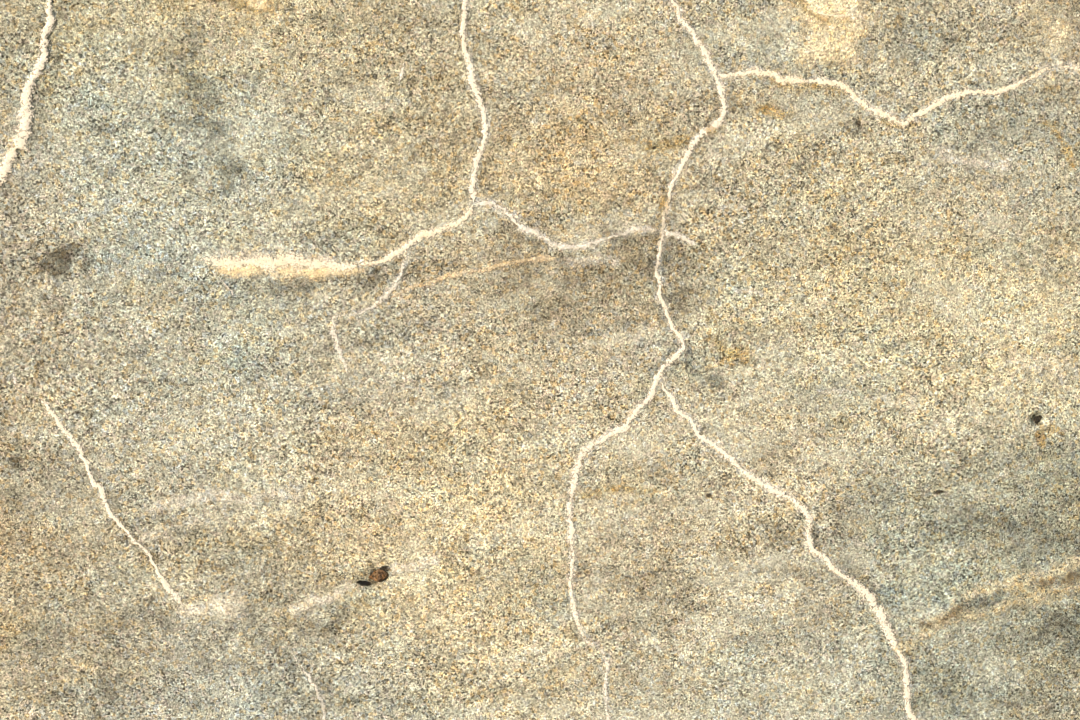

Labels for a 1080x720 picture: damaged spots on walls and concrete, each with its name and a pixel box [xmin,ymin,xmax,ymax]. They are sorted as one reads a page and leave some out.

crack [0,0,55,186]
crack [201,0,661,280]
crack [329,315,348,373]
crack [348,253,555,316]
crack [565,0,1080,720]
crack [41,400,183,606]
crack [277,623,327,720]